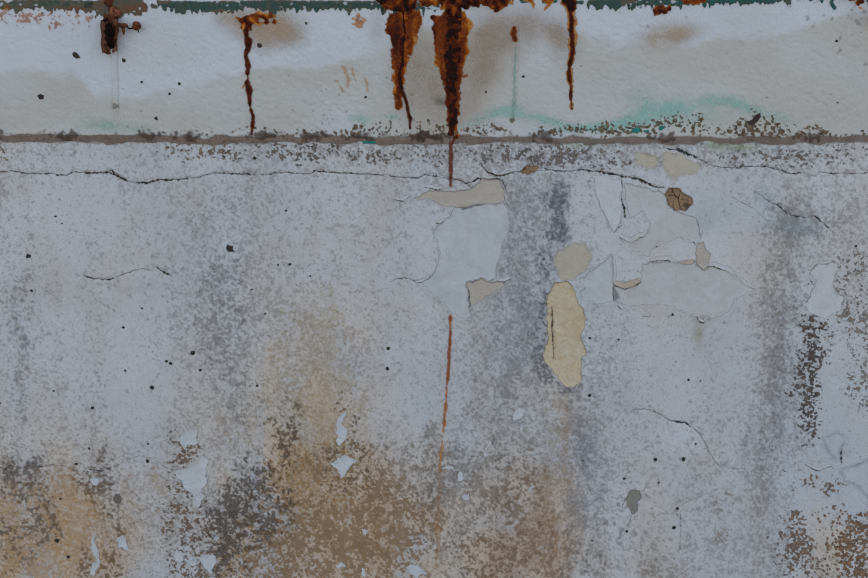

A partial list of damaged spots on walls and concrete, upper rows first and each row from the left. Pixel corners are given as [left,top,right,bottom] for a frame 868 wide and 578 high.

corrosion [235,11,277,134]
corrosion [376,0,578,187]
crack [0,165,664,218]
peeling [156,109,867,387]
crack [667,148,800,175]
water stain [0,457,108,578]
water stain [201,405,424,578]
corrosion [439,314,452,468]
crack [634,409,738,470]